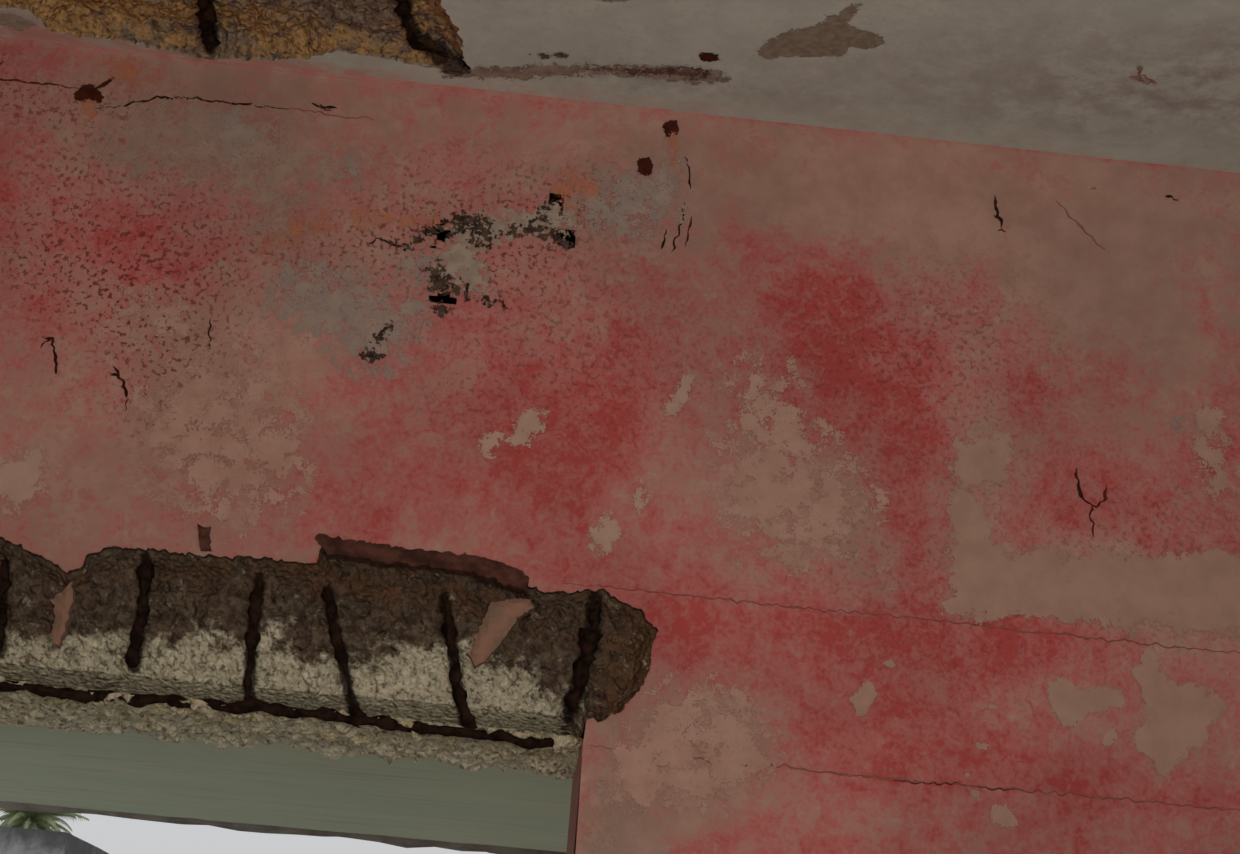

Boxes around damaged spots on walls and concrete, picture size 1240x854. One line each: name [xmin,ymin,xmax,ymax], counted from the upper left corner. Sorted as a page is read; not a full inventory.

spalling [0,0,471,72]
peeling [757,3,884,60]
crack [0,61,373,120]
leakage [440,52,732,86]
rust [637,157,653,176]
rust [662,120,680,167]
crack [994,196,1006,232]
peeling [380,200,585,318]
crack [41,337,58,374]
crack [110,366,129,412]
crack [1074,468,1108,537]
spalling [0,280,788,854]